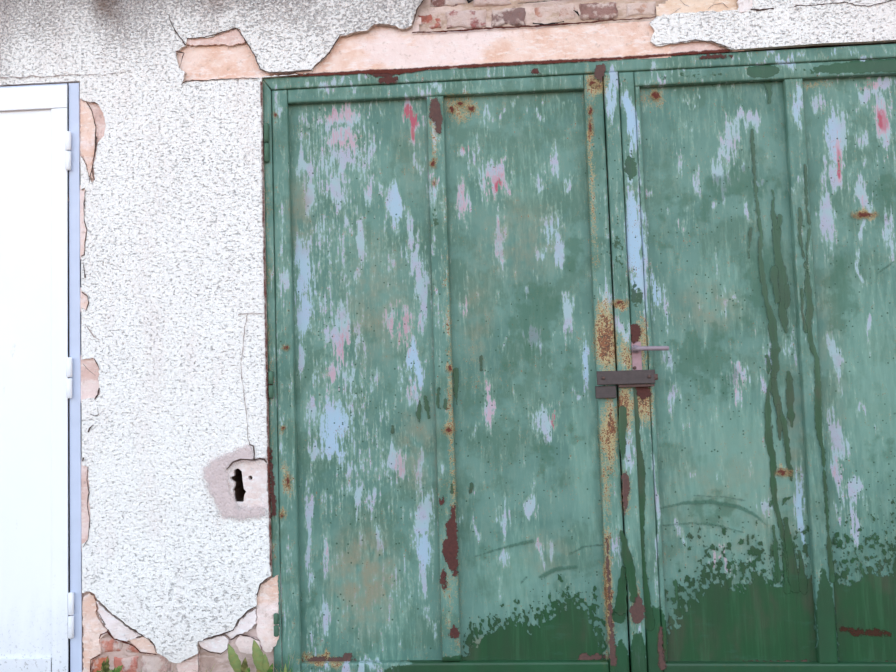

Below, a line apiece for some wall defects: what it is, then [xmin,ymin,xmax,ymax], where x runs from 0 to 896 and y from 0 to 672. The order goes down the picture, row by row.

flaking render [169,0,753,84]
peeling [428,97,444,134]
flaking render [79,95,106,312]
peeling [630,323,642,344]
flaking render [81,358,100,403]
corrosion [635,387,652,400]
spalling [204,444,270,520]
peeling [621,471,630,516]
peeling [442,505,459,571]
corrosion [440,569,459,590]
flaking render [82,569,282,672]
corrosion [839,626,892,637]